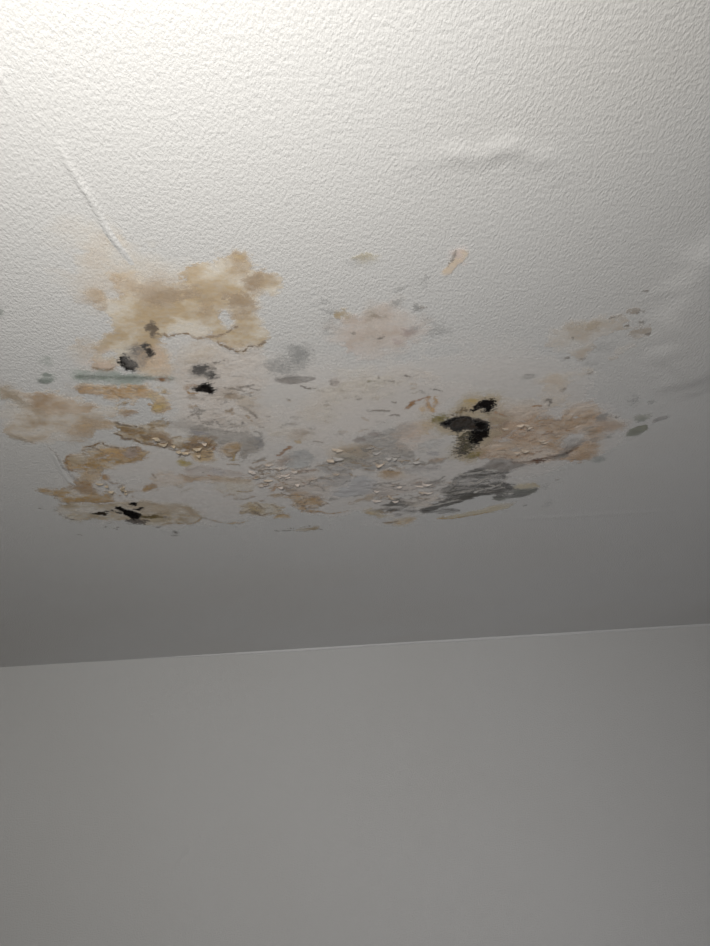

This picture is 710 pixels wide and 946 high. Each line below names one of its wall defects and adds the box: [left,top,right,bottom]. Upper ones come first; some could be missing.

water stain [1,250,667,534]